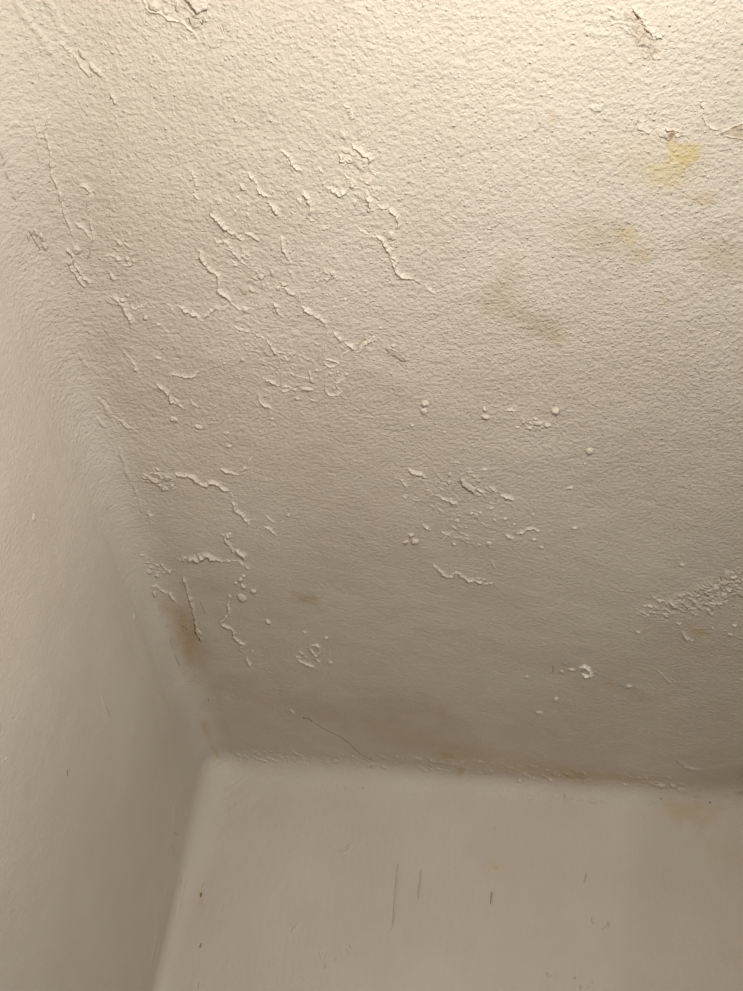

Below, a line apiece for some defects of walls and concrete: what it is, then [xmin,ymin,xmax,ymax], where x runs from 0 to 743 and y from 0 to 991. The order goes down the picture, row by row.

peeling [142,0,213,43]
peeling [718,121,743,146]
peeling [318,130,439,296]
water stain [540,118,743,311]
peeling [166,170,408,402]
water stain [454,245,576,354]
flaking render [140,457,253,526]
peeling [399,461,540,548]
peeling [138,532,251,602]
peeling [432,559,497,587]
peeling [634,566,743,622]